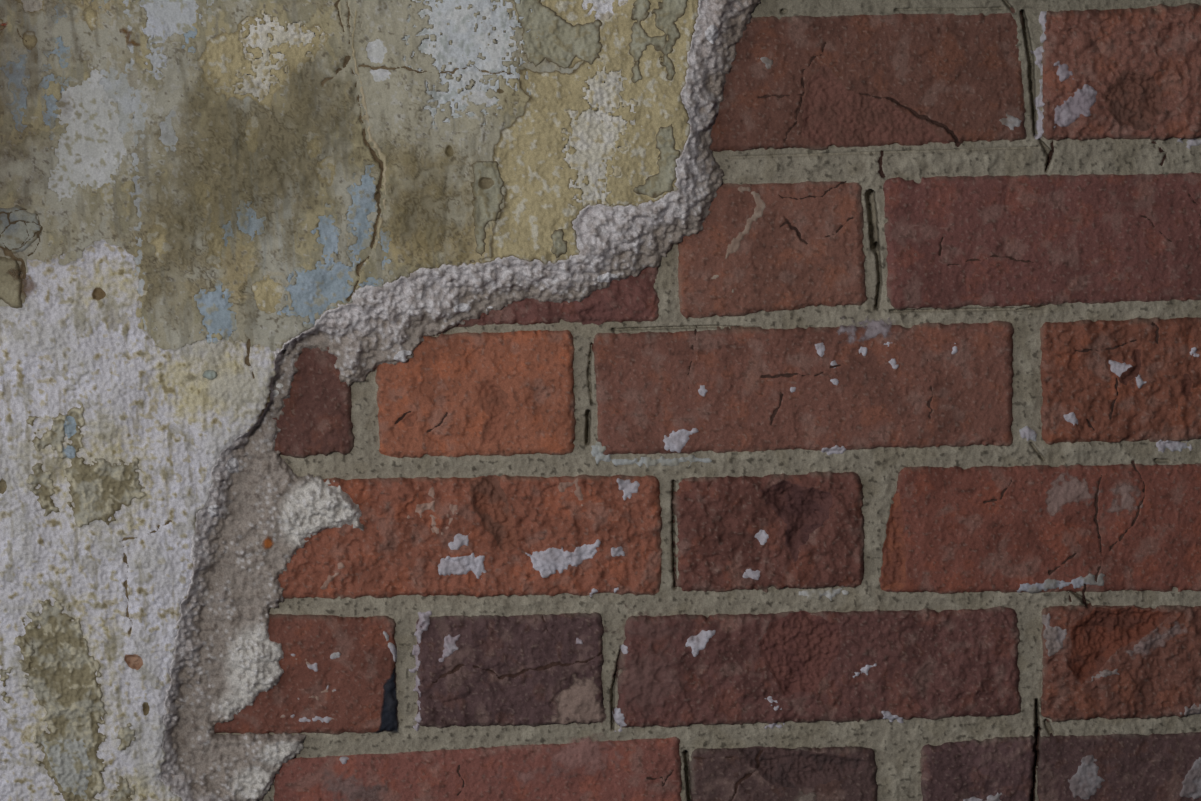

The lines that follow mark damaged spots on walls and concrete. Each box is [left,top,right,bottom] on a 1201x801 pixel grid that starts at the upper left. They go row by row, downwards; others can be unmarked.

crack [321,0,514,302]
crack [1045,140,1054,172]
crack [1152,141,1166,166]
peeling [0,0,761,801]